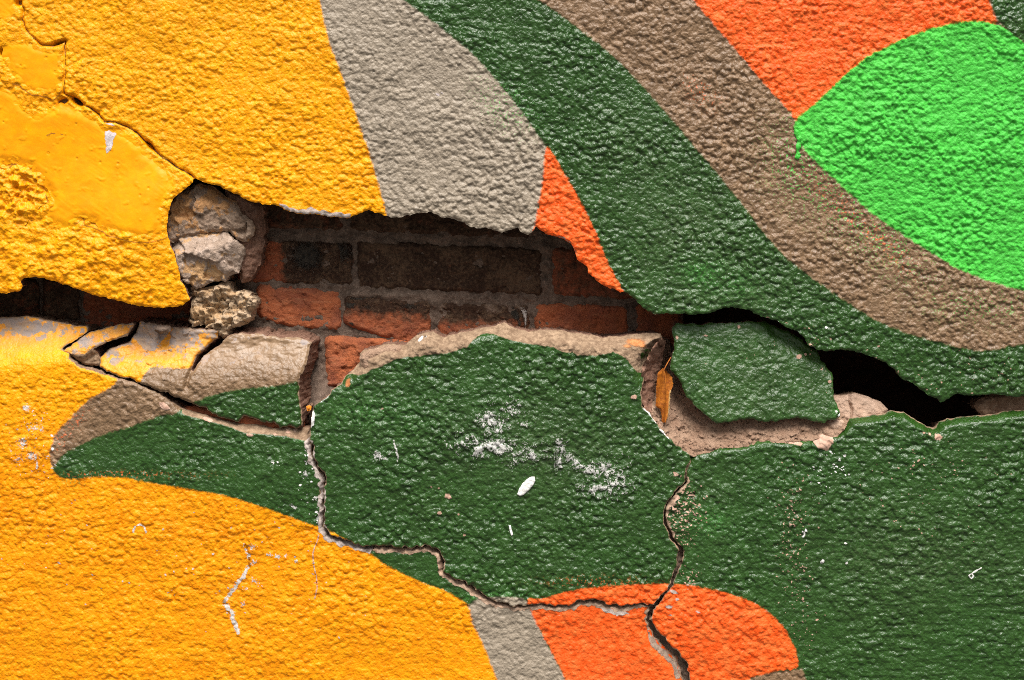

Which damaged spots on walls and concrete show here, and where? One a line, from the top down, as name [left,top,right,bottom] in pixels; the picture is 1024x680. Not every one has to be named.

flaking render [0,164,47,226]
peeling [279,204,351,218]
spalling [0,313,253,437]
spalling [141,316,353,436]
peeling [920,420,963,496]
crack [304,437,690,680]